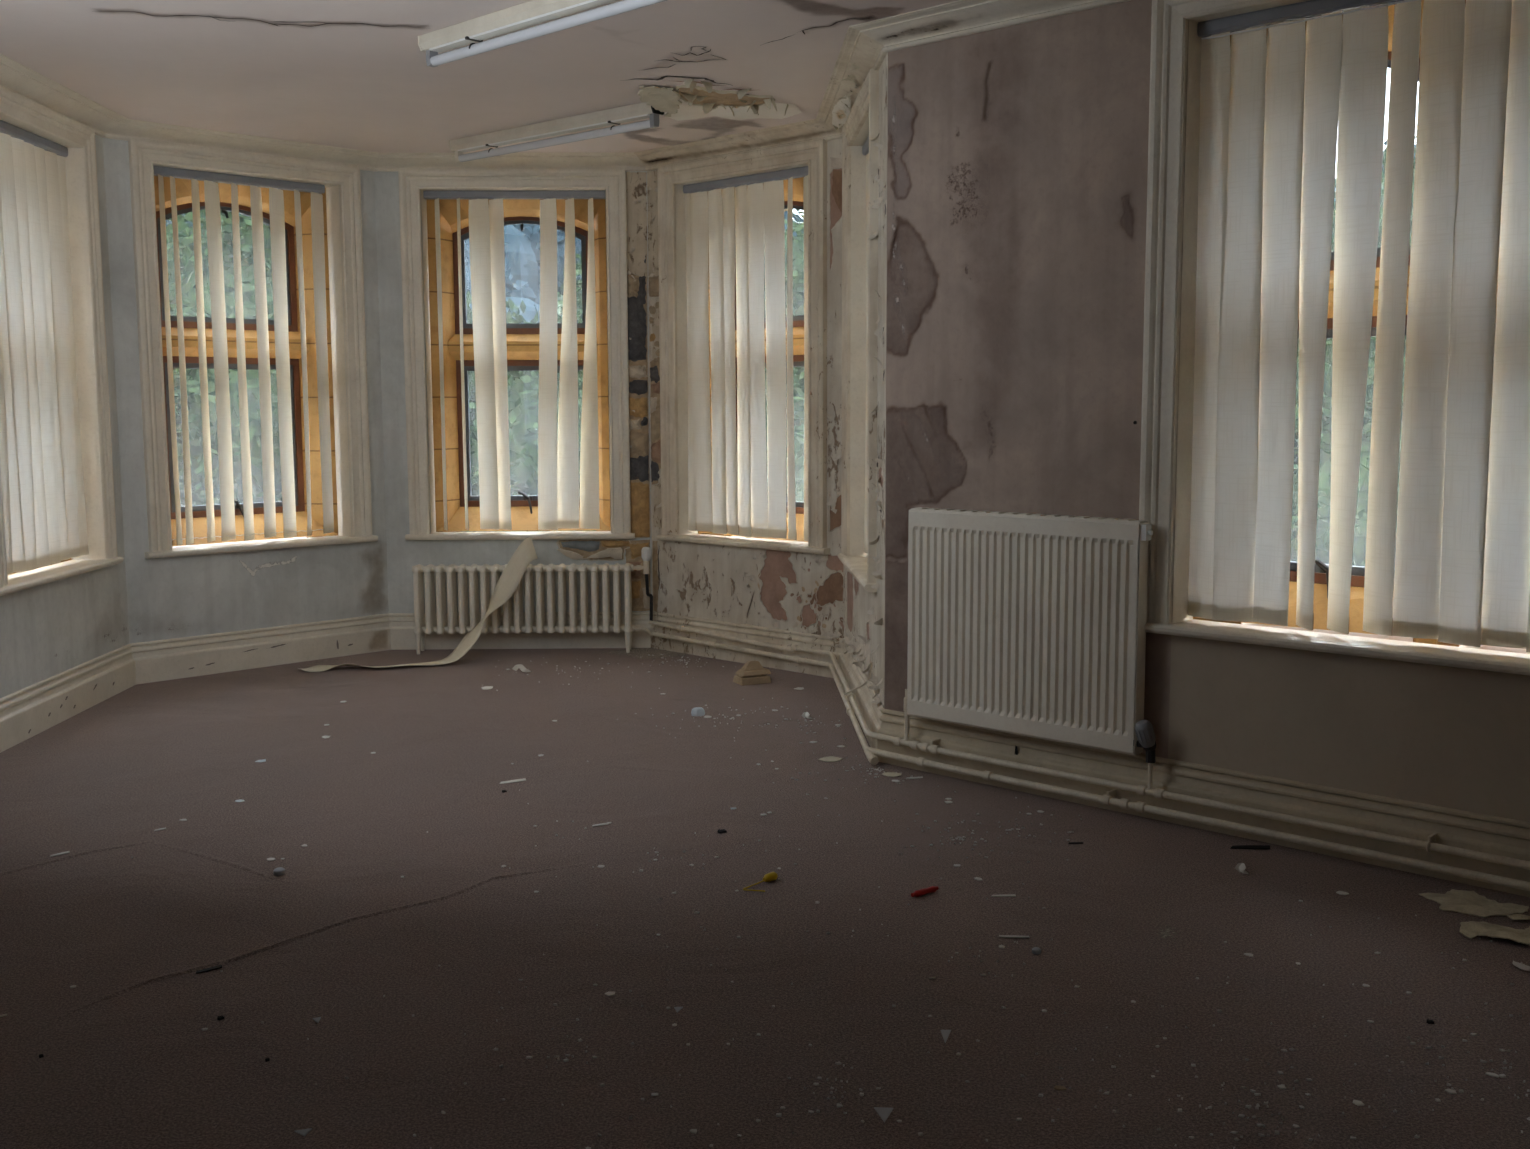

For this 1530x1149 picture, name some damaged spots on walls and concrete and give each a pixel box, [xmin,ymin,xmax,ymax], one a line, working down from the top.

crack [107,11,418,28]
peeling [630,76,802,121]
peeling [744,438,885,709]